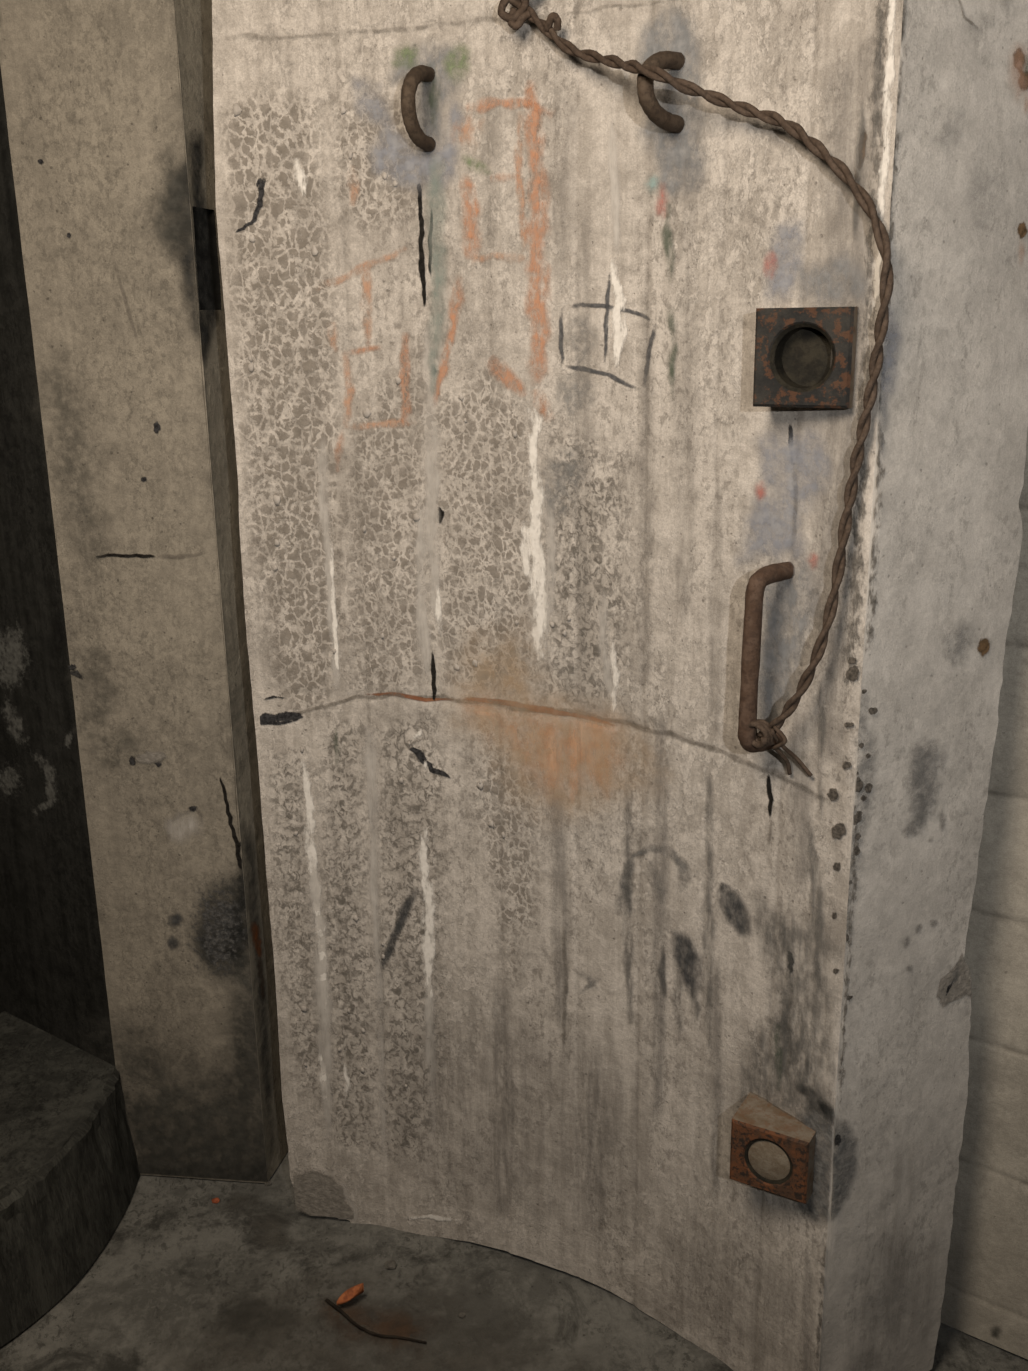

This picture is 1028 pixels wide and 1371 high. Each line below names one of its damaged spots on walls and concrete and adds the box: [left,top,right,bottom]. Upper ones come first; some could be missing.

crack [437,507,445,523]
crack [295,653,813,837]
water stain [122,837,270,1181]
spalling [937,955,972,1007]